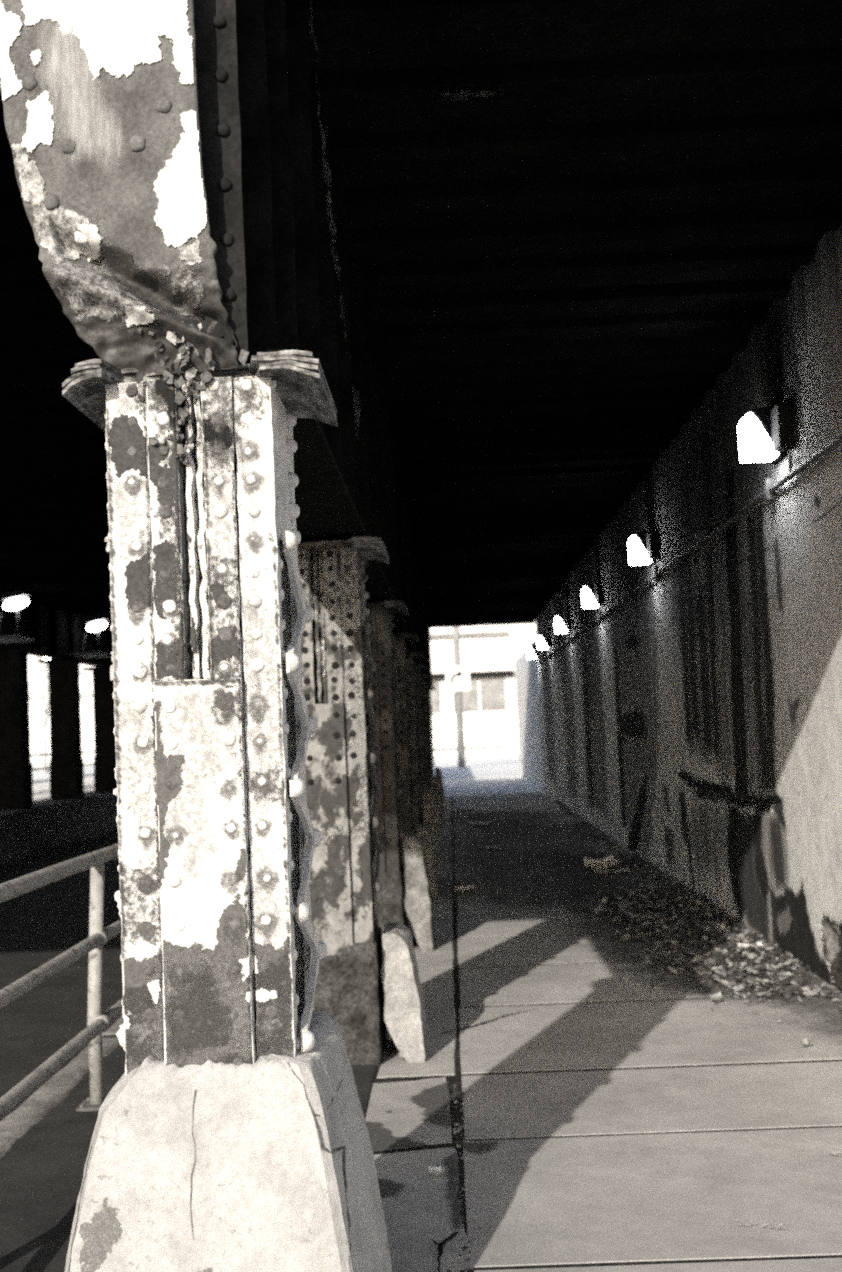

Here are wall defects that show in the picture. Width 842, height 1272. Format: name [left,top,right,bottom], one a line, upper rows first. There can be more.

peeling [0,0,194,264]
peeling [153,110,207,265]
peeling [108,414,175,508]
peeling [124,539,180,619]
corrosion [54,243,290,987]
peeling [153,625,272,699]
peeling [194,691,235,713]
peeling [210,580,230,610]
leakage [455,297,842,1032]
peeling [120,700,202,896]
peeling [122,848,295,1075]
crack [430,1231,459,1272]